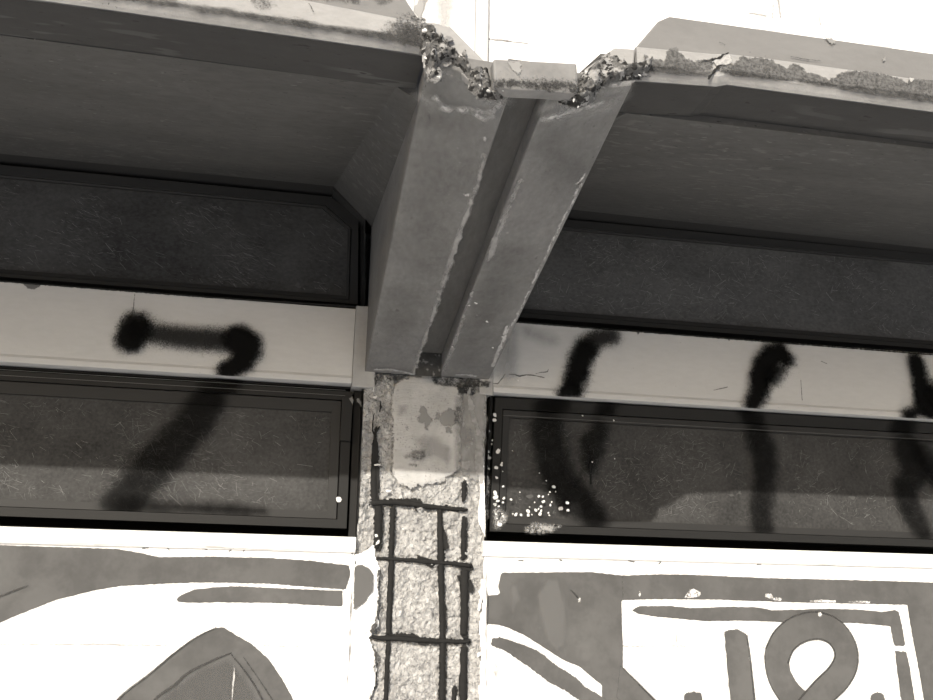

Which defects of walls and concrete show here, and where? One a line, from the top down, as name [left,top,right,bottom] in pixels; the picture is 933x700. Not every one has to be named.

spalling [414,0,505,100]
crack [703,52,732,80]
spalling [558,52,653,109]
water stain [375,374,407,382]
water stain [433,377,491,395]
spalling [349,161,486,700]
water stain [418,406,460,433]